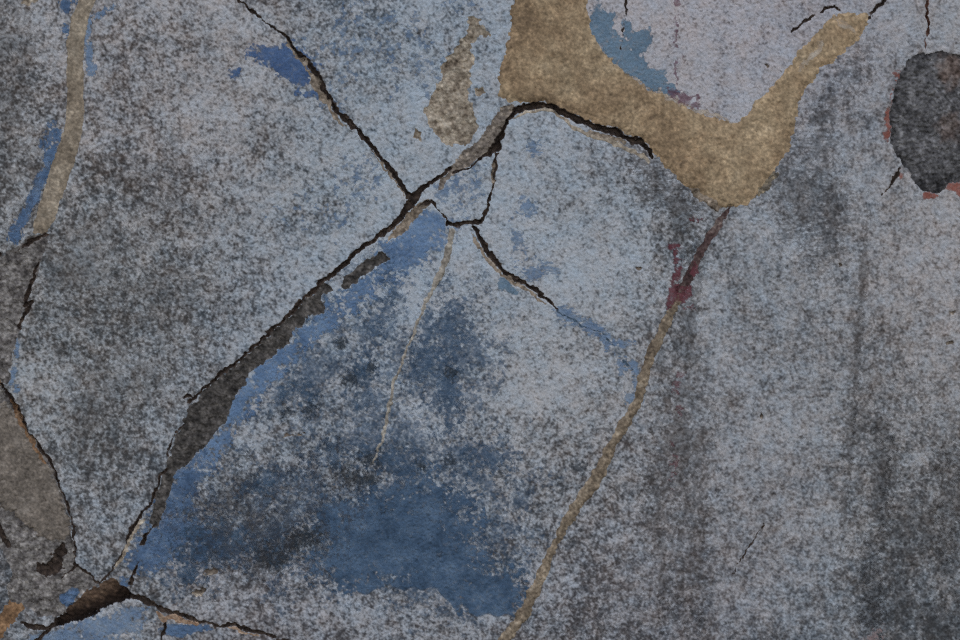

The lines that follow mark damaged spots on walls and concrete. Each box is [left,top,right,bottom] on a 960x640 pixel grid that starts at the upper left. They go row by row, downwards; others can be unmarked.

crack [791,5,841,33]
crack [868,0,887,19]
crack [923,0,931,49]
crack [881,167,901,196]
peeling [0,0,530,640]
crack [0,0,654,640]